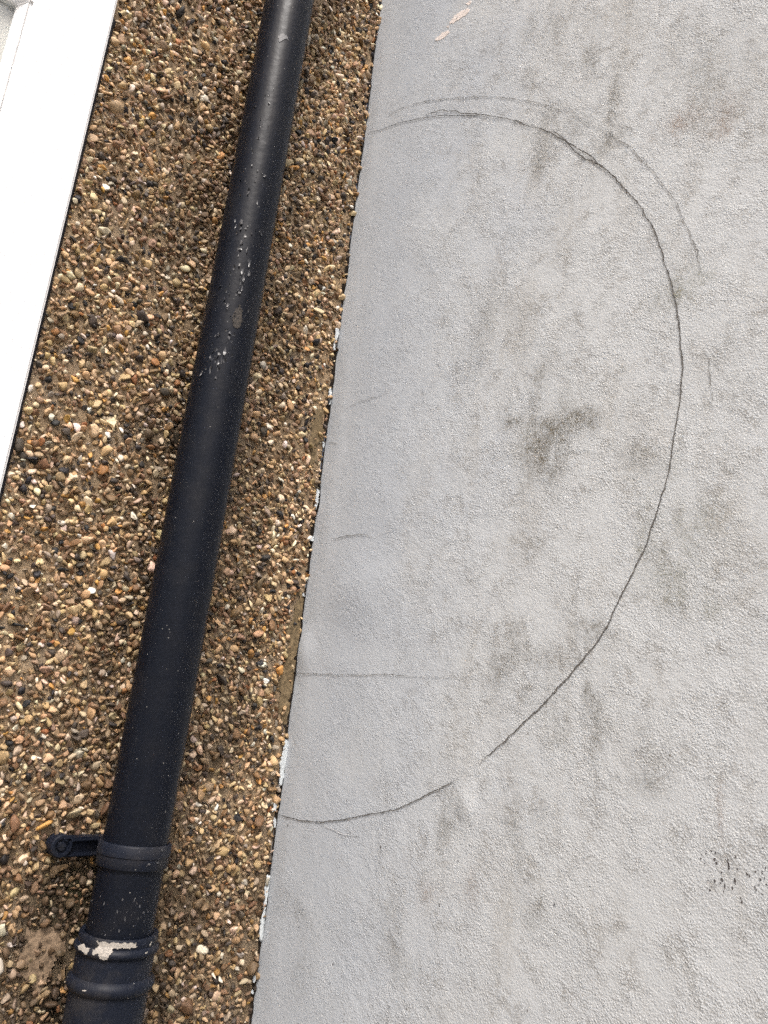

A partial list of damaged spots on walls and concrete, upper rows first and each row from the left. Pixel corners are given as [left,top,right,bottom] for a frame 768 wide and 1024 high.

crack [285,2,713,760]
crack [249,770,457,1024]